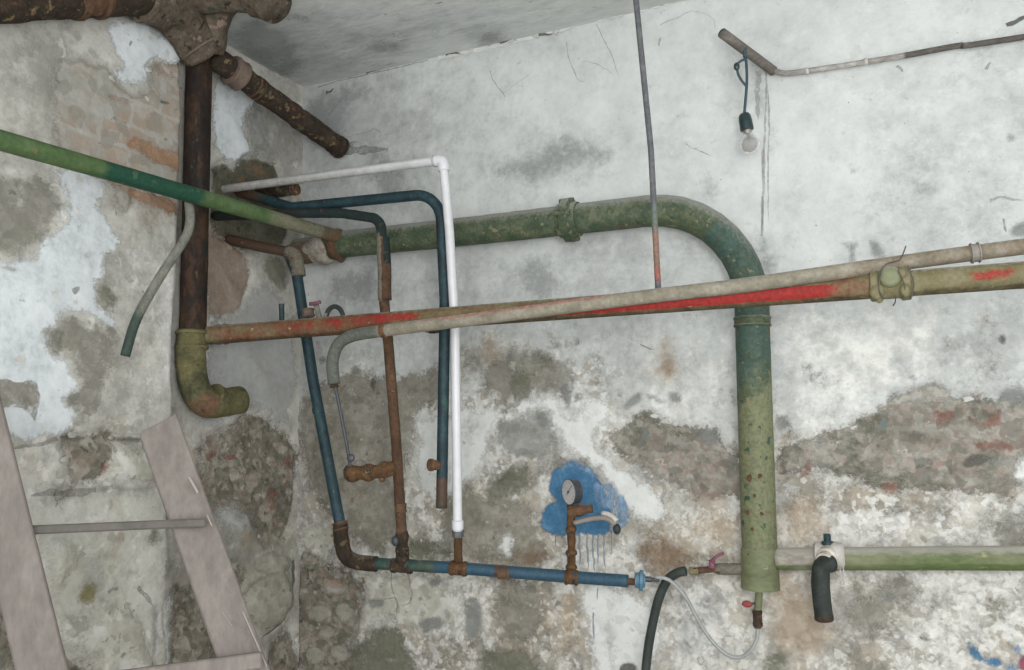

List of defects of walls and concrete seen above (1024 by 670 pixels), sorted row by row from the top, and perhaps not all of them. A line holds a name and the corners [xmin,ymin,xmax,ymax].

spalling [52,59,181,182]
spalling [107,180,179,213]
leakage [48,317,117,423]
flaking render [194,367,438,554]
leakage [416,350,665,522]
spalling [776,383,1024,499]
spalling [268,551,470,670]